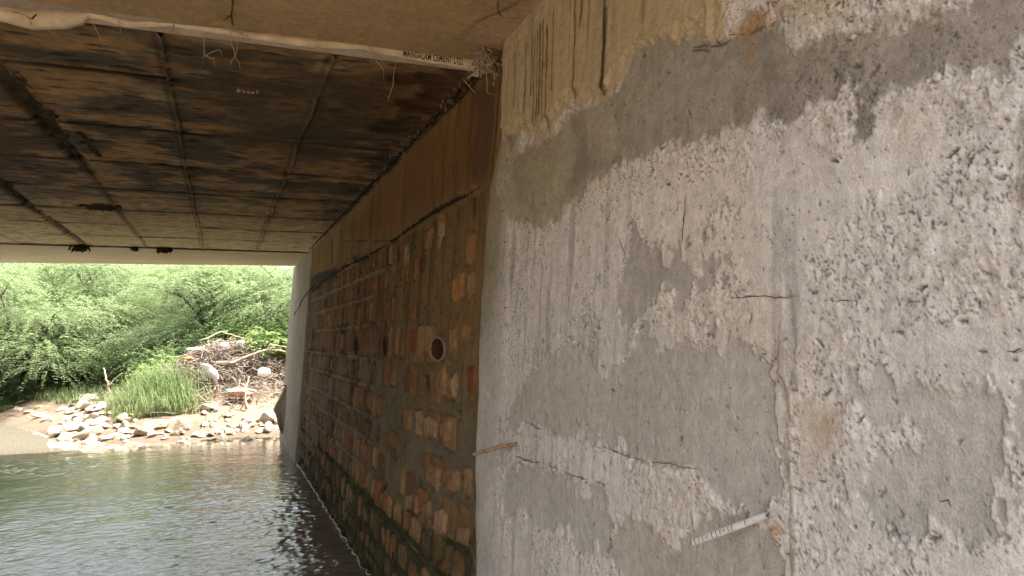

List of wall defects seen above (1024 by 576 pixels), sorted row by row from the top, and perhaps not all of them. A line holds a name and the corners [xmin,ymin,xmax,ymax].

water stain [0,47,93,173]
water stain [154,0,1024,240]
spalling [931,229,1024,306]
crack [515,456,608,491]
crack [603,446,697,469]
peeling [815,288,1024,559]